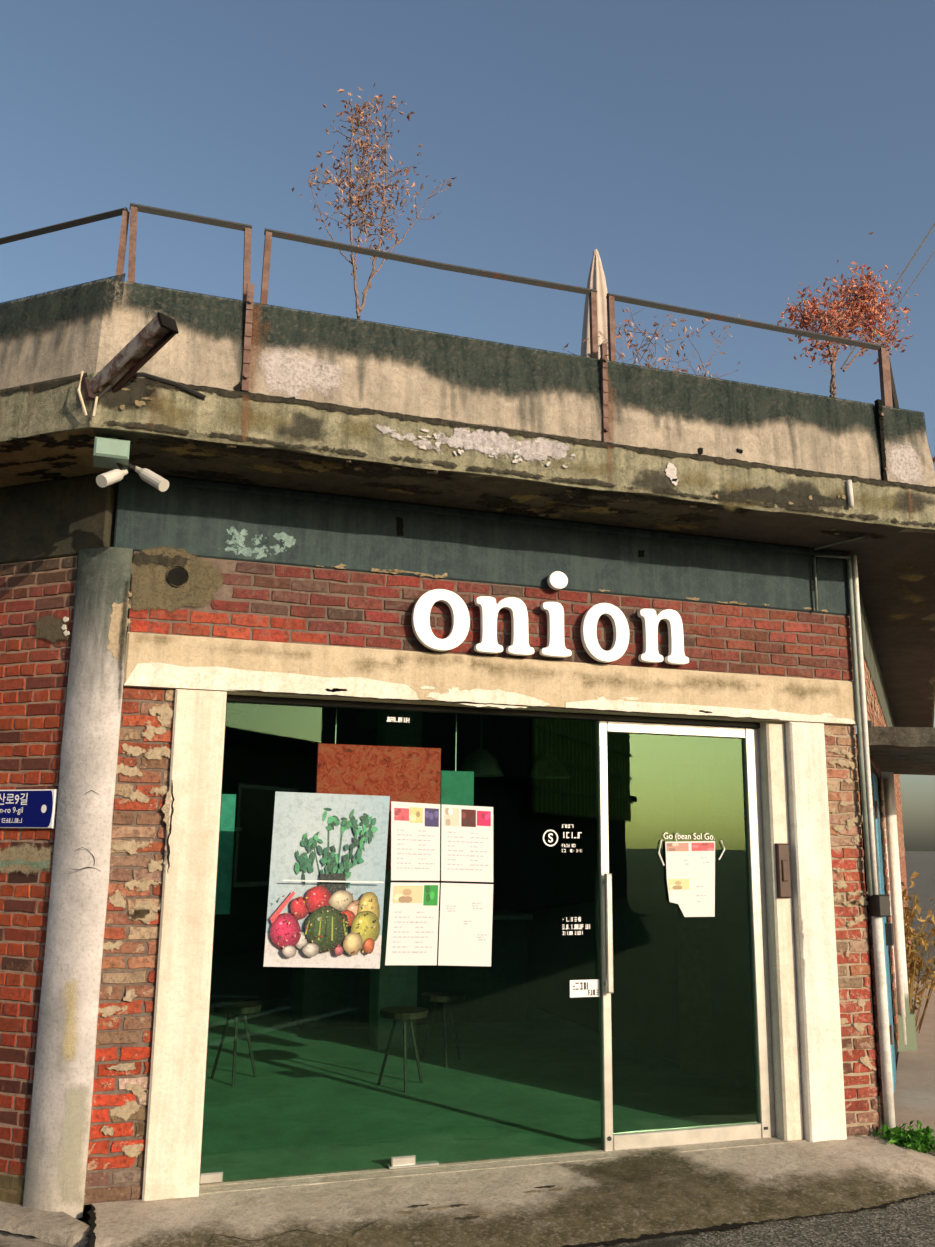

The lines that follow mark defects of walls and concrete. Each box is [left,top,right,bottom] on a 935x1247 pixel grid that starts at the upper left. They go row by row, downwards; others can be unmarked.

water stain [0,273,930,483]
peeling [375,424,577,468]
peeling [219,526,296,559]
peeling [371,568,448,578]
peeling [106,581,550,709]
peeling [565,697,856,724]
spalling [161,779,175,872]
peeling [0,843,53,874]